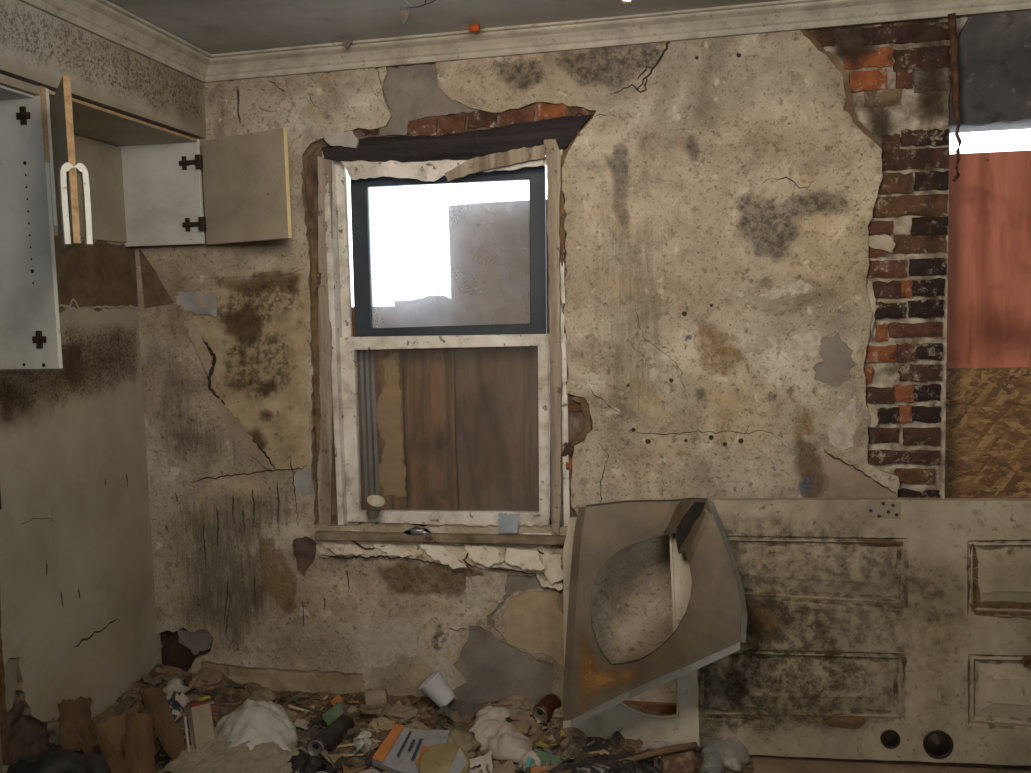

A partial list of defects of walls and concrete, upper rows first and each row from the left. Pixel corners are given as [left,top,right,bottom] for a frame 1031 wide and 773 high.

water stain [48,347,114,386]
water stain [219,274,297,292]
spalling [178,138,499,528]
spalling [344,62,597,278]
peeling [761,279,812,300]
water stain [739,193,847,257]
flaking render [786,15,970,498]
spalling [518,394,593,528]
water stain [185,486,279,634]
spalling [158,621,419,695]
flaking render [292,536,564,704]